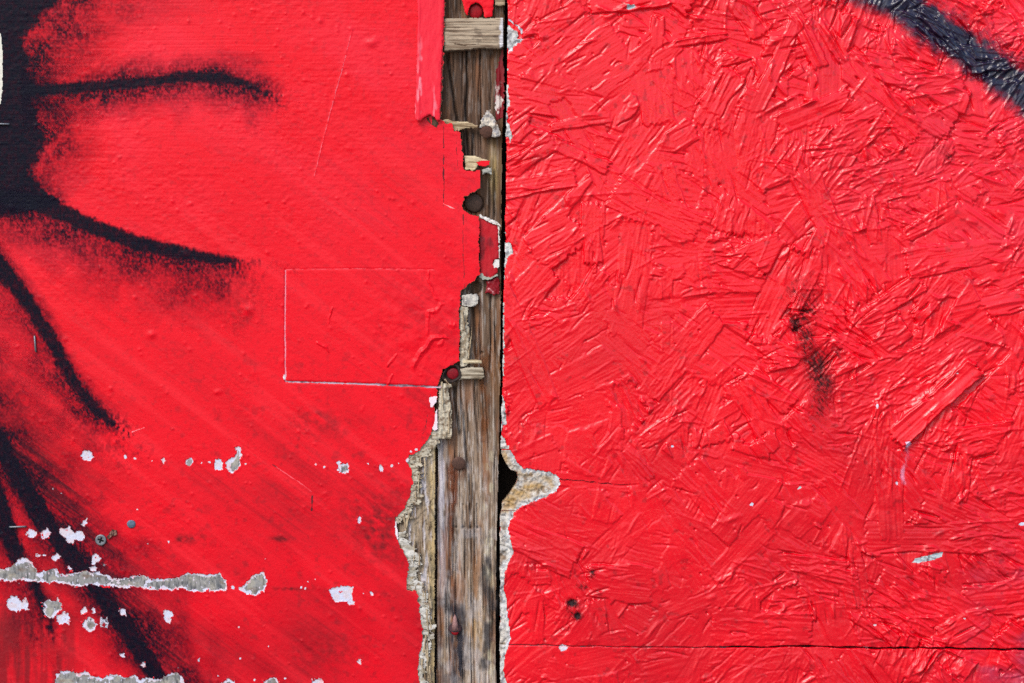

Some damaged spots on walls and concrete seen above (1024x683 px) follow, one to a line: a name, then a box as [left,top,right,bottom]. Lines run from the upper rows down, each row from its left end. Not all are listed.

spalling [507,19,522,51]
spalling [505,85,513,141]
spalling [479,214,513,280]
peeling [429,396,438,431]
peeling [186,446,247,473]
peeling [25,518,88,545]
spalling [499,396,560,683]
peeling [0,553,267,632]
peeling [329,586,373,605]
peeling [55,662,184,683]